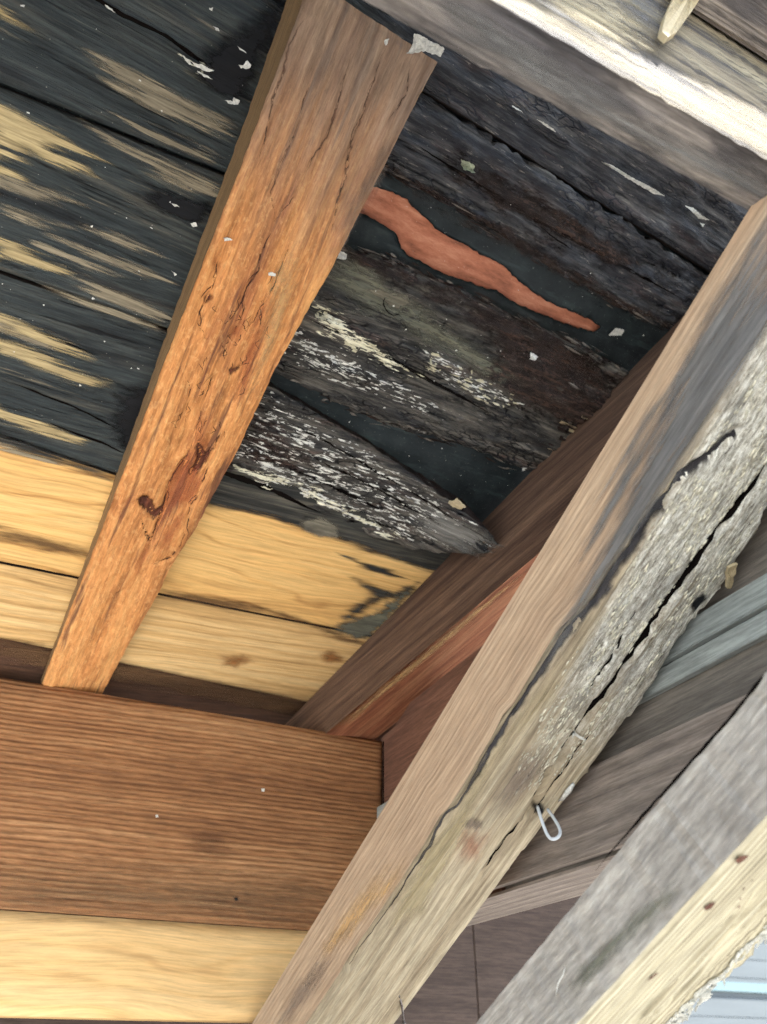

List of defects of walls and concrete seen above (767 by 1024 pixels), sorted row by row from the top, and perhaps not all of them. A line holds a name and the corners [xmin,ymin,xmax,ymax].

peeling [284,300,524,412]
water stain [1,532,87,553]
water stain [0,437,109,480]
water stain [173,594,264,610]
water stain [208,470,452,645]
peeling [233,391,477,545]
crack [533,465,765,804]
crack [595,674,764,871]